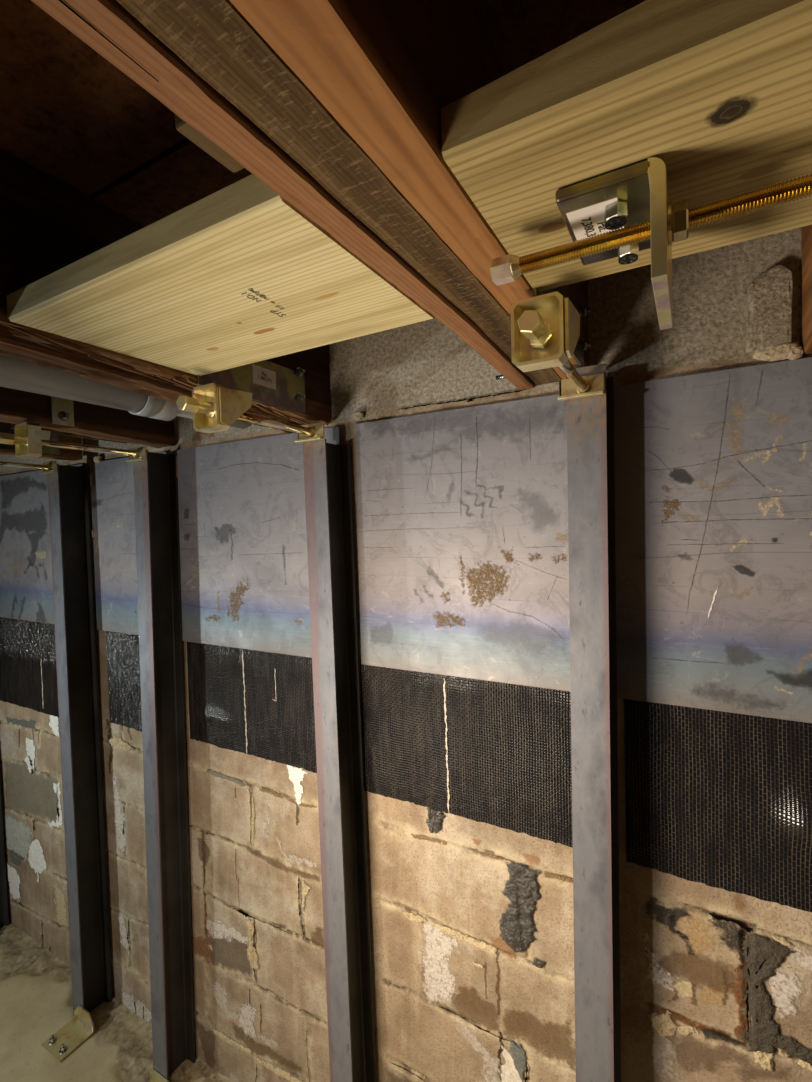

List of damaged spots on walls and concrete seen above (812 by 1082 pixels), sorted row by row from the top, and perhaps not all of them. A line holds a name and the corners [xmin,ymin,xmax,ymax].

corrosion [205,578,250,622]
corrosion [433,592,464,628]
corrosion [459,547,566,607]
damp [106,719,129,853]
peeling [6,863,21,902]
peeling [28,839,47,883]
damp [198,832,251,975]
crack [222,877,311,980]
damp [212,982,300,1071]
crack [436,1003,528,1082]
spalling [648,1010,699,1039]
spalling [754,1049,812,1072]